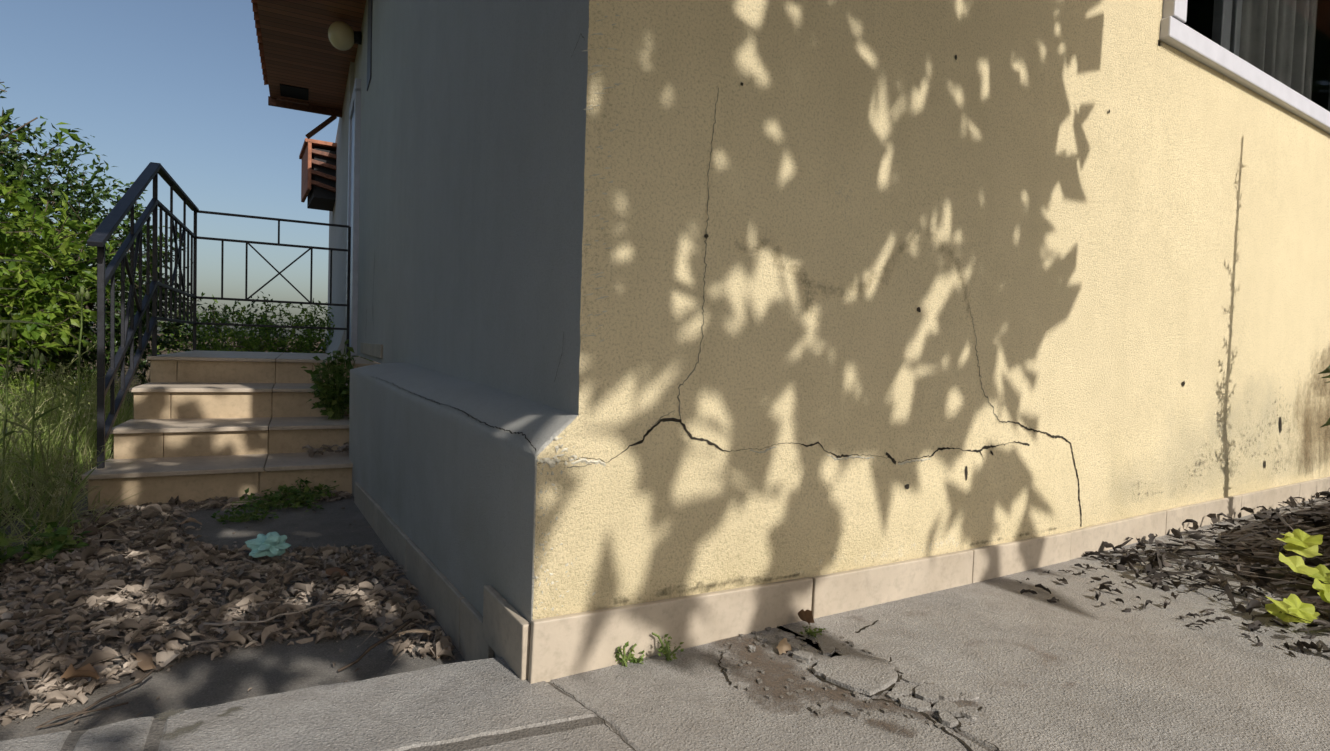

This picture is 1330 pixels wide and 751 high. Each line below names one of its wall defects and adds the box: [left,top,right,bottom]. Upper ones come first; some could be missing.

crack [376,88,1082,526]
damp [1281,408,1330,464]